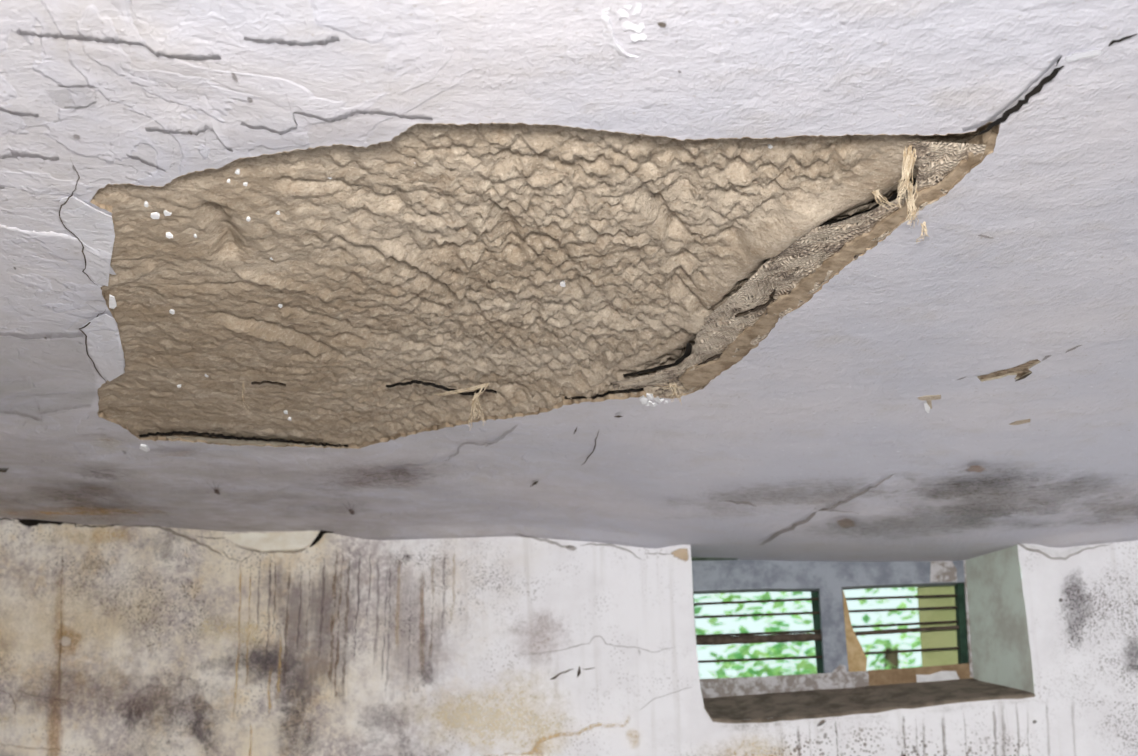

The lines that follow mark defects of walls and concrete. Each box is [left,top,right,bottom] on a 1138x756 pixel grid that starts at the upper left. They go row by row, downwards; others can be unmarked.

crack [953,31,1138,136]
spalling [0,64,1000,452]
spalling [973,350,1041,382]
water stain [832,475,1104,534]
water stain [182,560,353,749]
water stain [1066,582,1138,647]